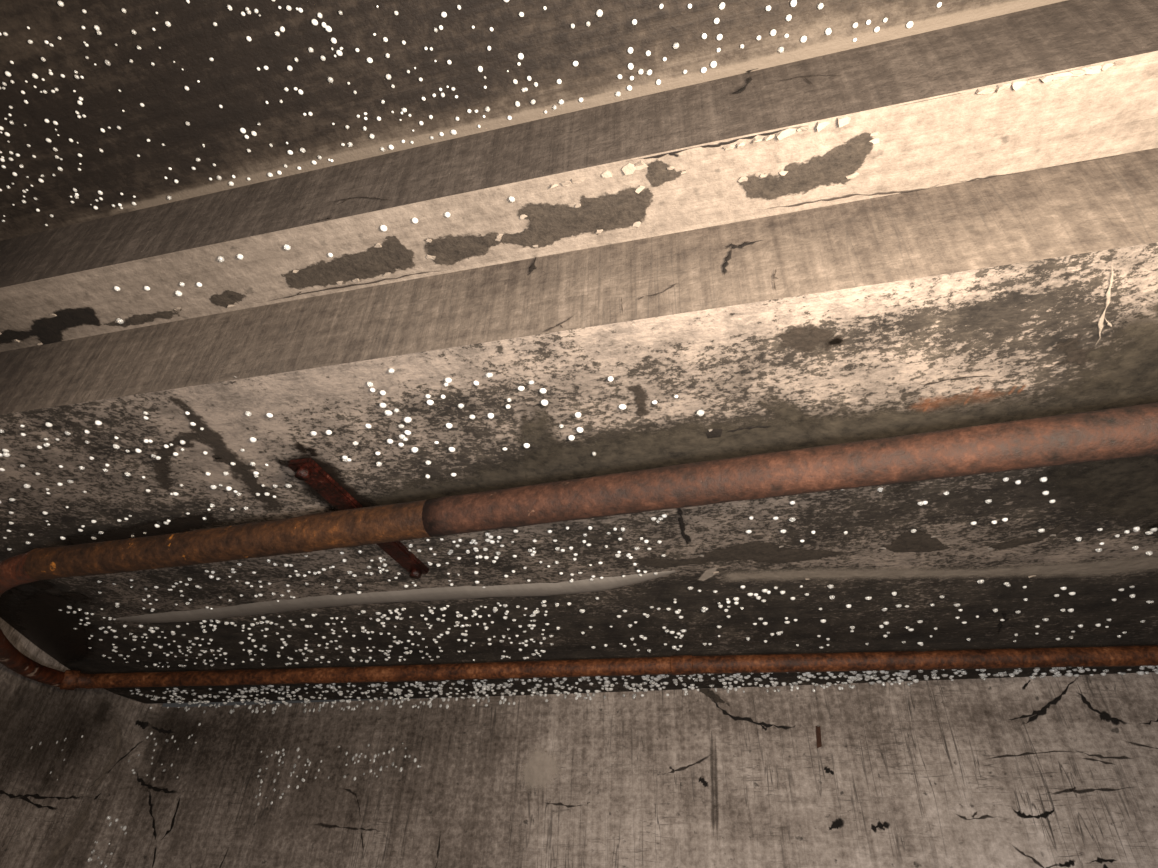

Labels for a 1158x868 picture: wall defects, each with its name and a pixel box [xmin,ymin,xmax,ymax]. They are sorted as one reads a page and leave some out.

spalling [723,116,851,151]
spalling [738,131,880,200]
spalling [281,160,687,290]
spalling [0,307,181,345]
leakage [279,305,1158,509]
leakage [1048,454,1158,531]
crack [712,700,792,731]
crack [958,680,1158,820]
crack [1016,848,1116,868]